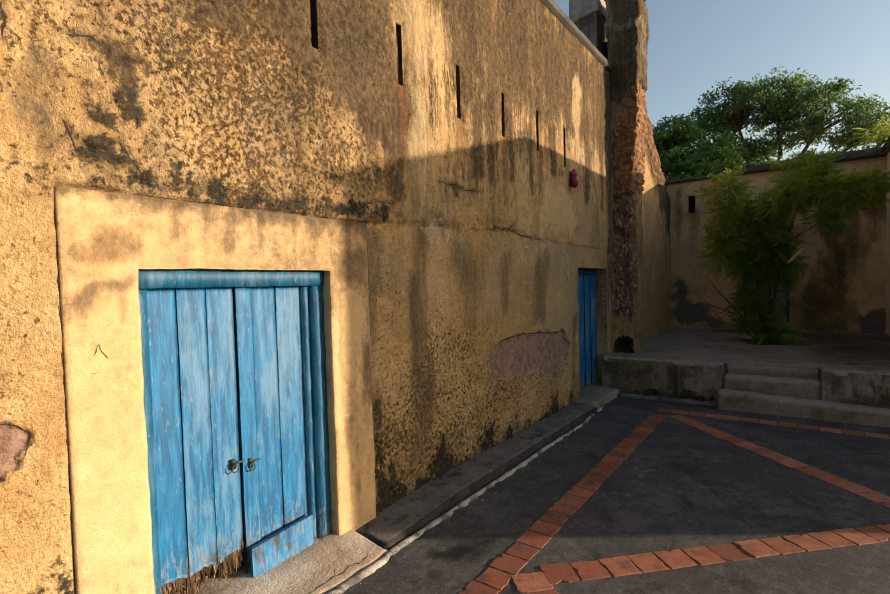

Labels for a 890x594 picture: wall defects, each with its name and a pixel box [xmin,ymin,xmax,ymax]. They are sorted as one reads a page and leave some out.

damp [72,0,415,237]
damp [435,0,649,303]
flaking render [611,78,663,316]
flaking render [489,328,570,379]
flaking render [0,421,36,483]
damp [364,355,574,515]
damp [30,555,75,594]
crack [310,547,372,594]